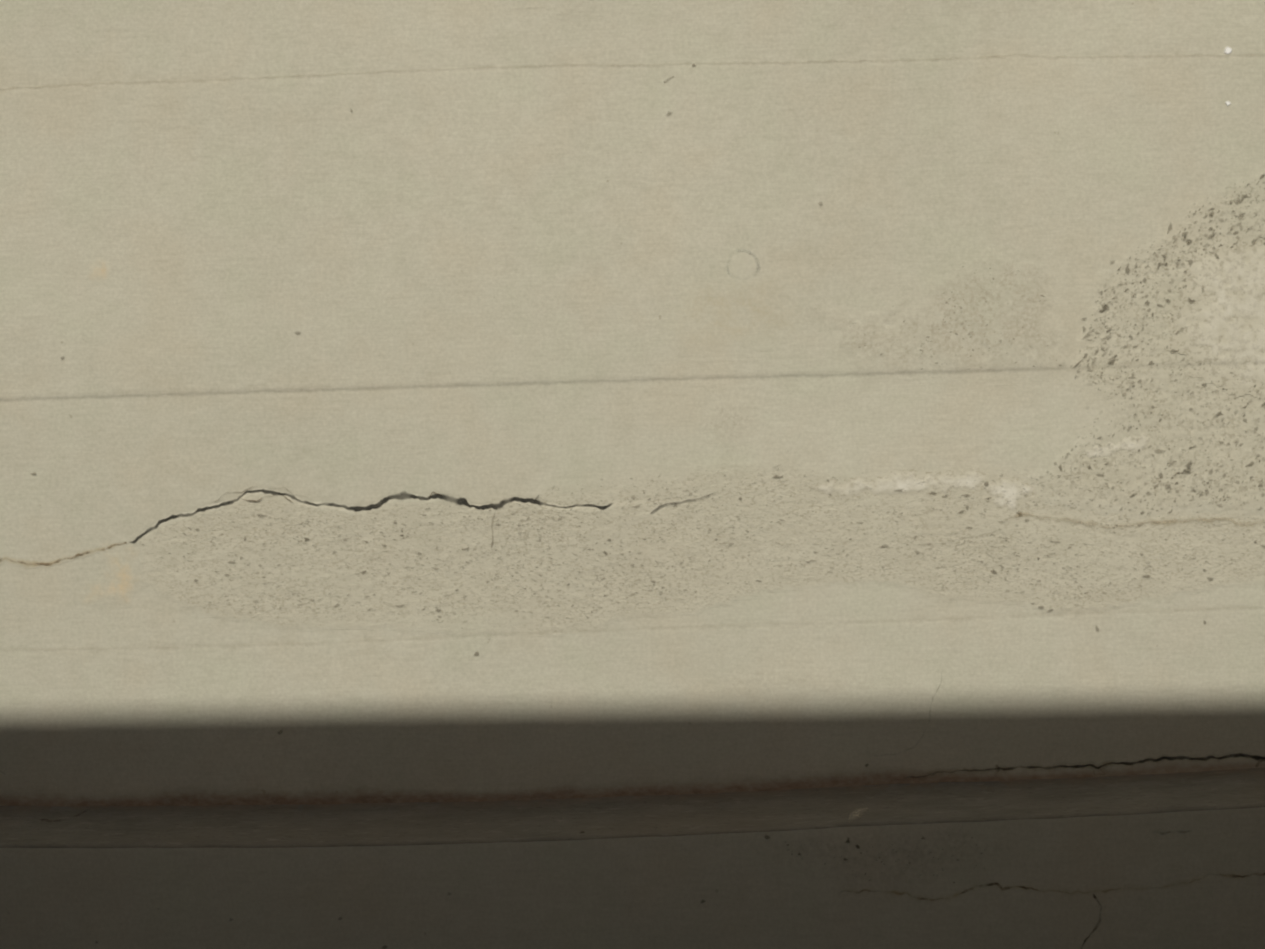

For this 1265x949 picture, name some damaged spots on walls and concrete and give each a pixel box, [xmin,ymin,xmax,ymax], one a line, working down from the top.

spalling [134,166,1265,655]
crack [0,489,611,570]
crack [1000,753,1265,770]